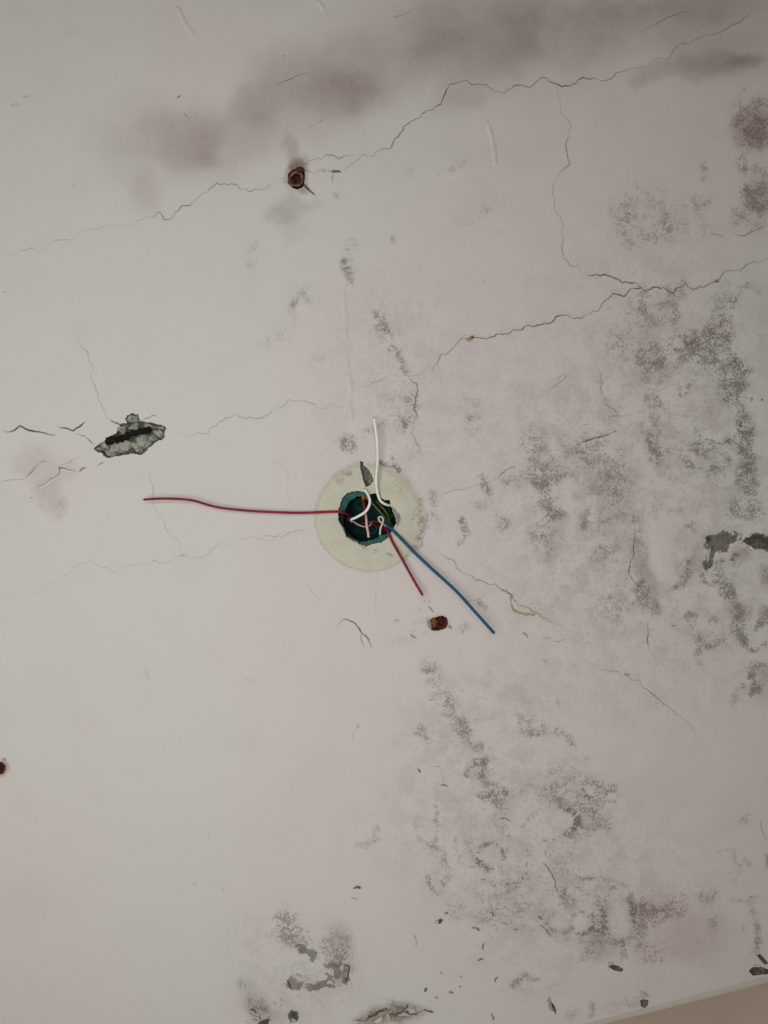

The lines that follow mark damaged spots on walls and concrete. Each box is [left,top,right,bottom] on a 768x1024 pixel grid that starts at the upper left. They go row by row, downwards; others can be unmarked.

crack [430,256,768,371]
crack [3,422,93,444]
spalling [94,413,166,458]
peeling [702,530,768,571]